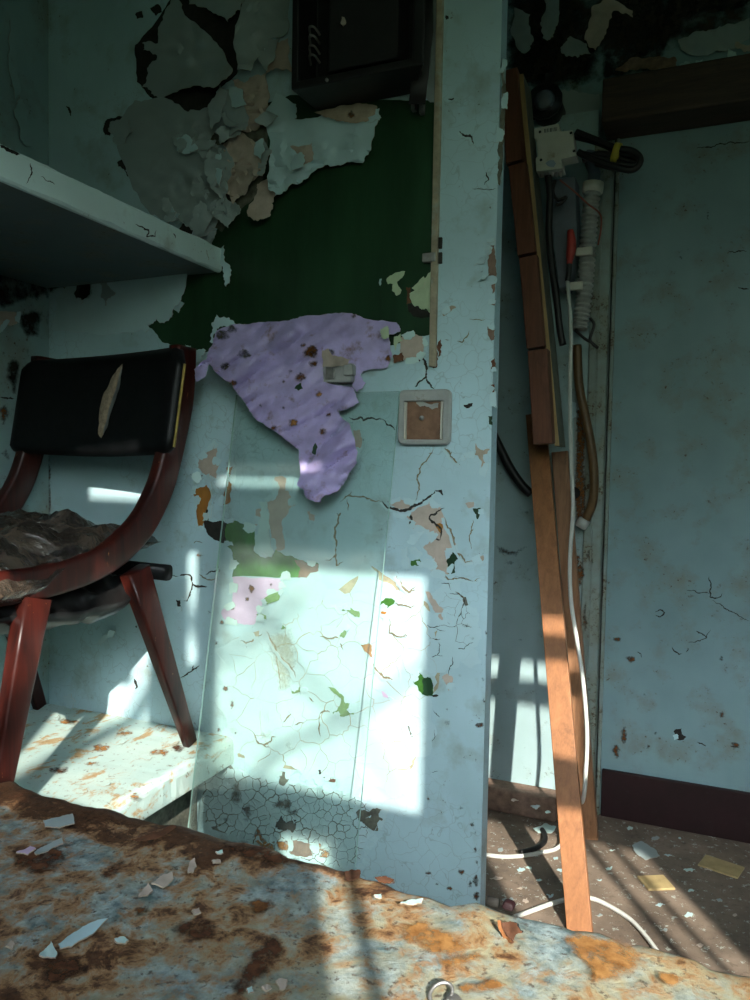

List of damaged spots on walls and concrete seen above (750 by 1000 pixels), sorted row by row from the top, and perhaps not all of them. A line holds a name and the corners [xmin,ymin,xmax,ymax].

peeling [510,0,560,54]
peeling [561,0,633,58]
peeling [615,18,750,72]
peeling [478,238,497,306]
peeling [52,0,449,630]
crack [348,416,395,430]
peeling [388,497,460,577]
crack [687,578,748,621]
crack [181,448,482,871]
corrosion [232,784,250,817]
corrosion [254,829,289,850]